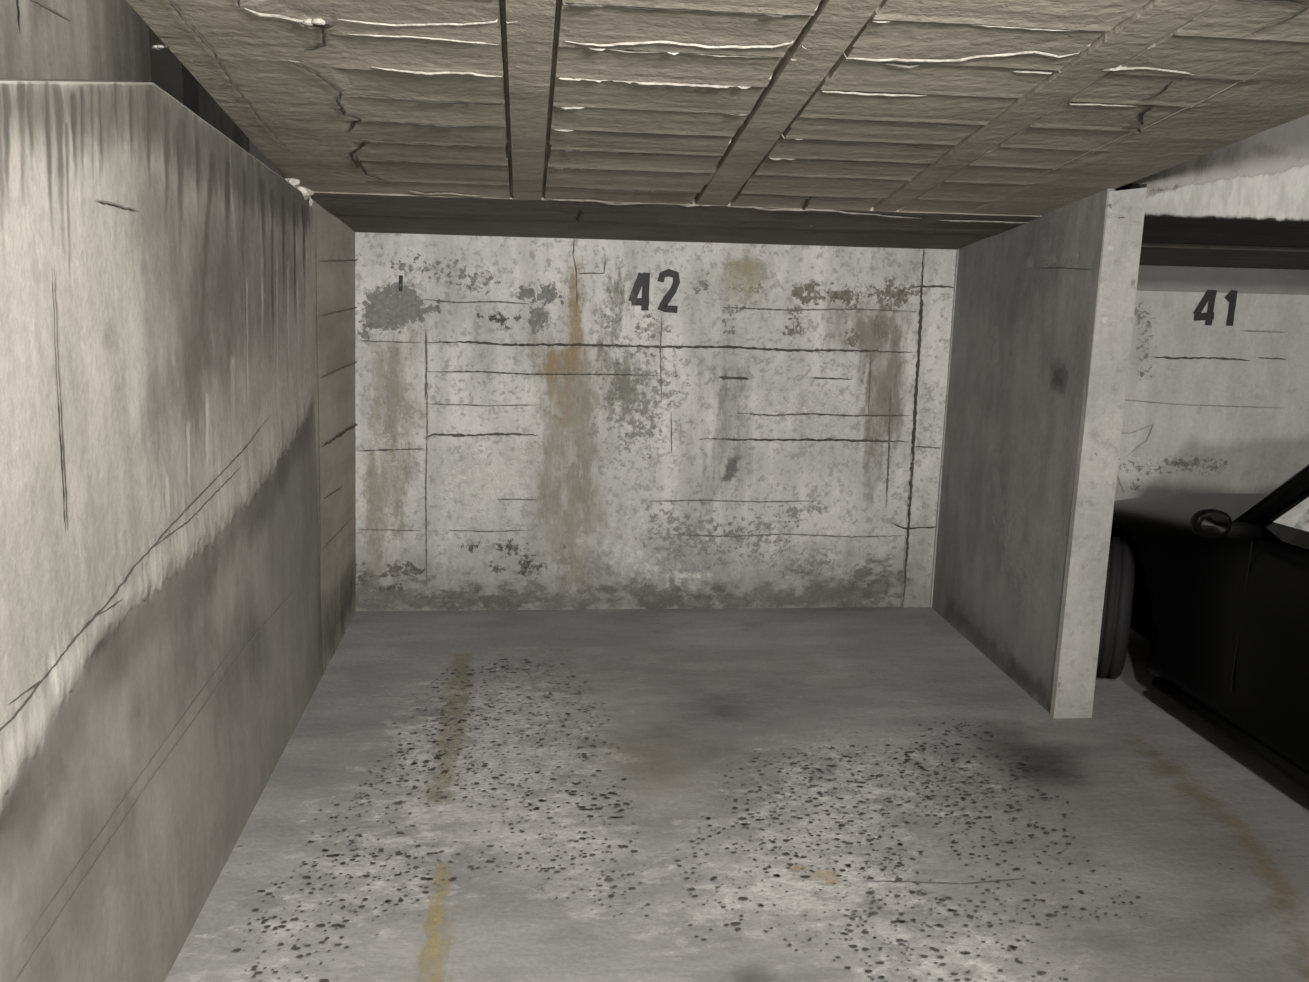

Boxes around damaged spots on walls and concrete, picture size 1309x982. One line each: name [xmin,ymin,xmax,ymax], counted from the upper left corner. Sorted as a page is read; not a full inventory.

damp [0,83,310,314]
crack [169,0,294,156]
crack [285,29,510,182]
crack [54,270,68,528]
crack [0,415,271,731]
damp [150,356,310,587]
damp [356,472,903,610]
damp [9,644,79,758]